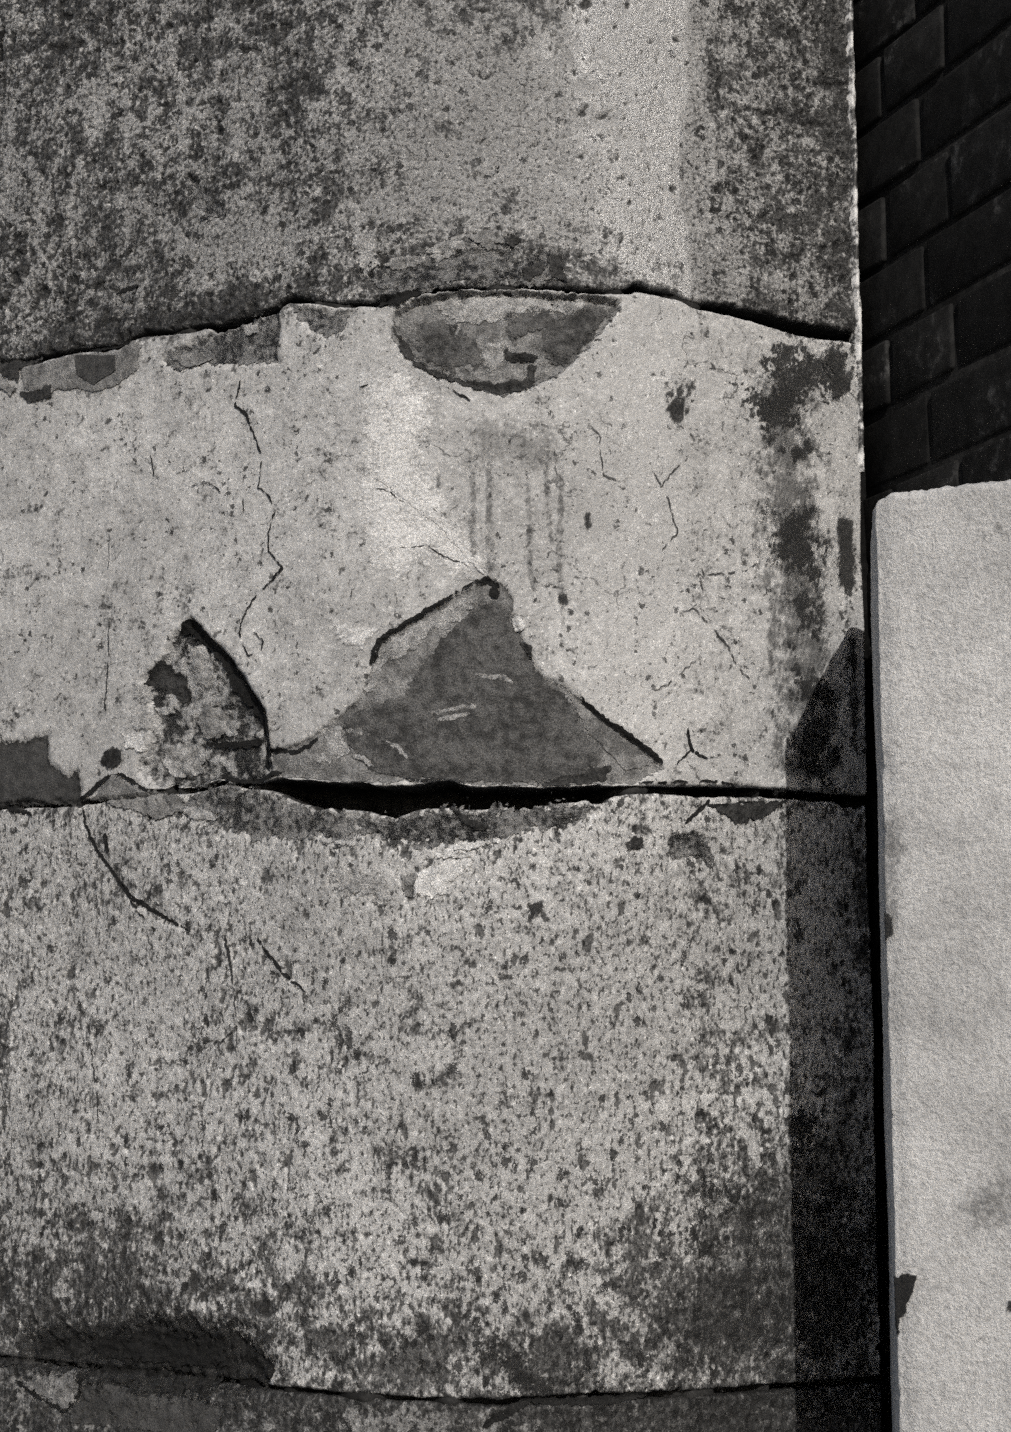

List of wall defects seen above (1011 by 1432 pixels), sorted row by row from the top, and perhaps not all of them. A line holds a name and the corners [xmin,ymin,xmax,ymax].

spalling [346,229,622,397]
water stain [665,377,697,423]
crack [150,368,283,656]
water stain [731,333,861,801]
spalling [0,576,665,907]
crack [82,807,188,930]
spalling [668,829,715,868]
spalling [716,799,784,824]
crack [201,936,306,1056]